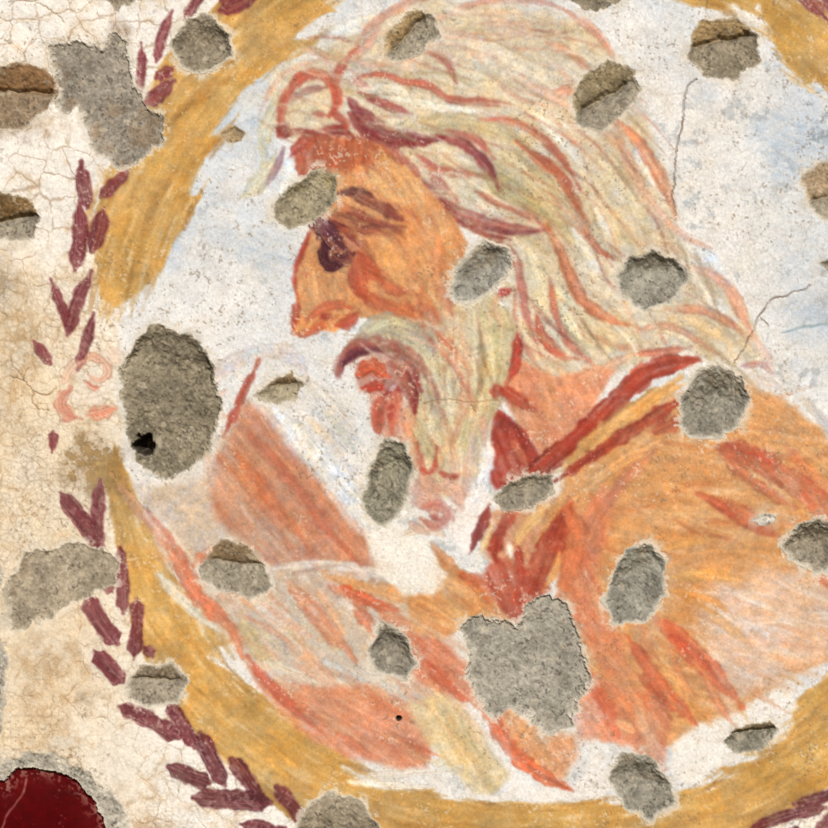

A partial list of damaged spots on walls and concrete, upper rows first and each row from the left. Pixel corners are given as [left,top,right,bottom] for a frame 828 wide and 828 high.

crack [9,0,65,24]
spalling [47,31,166,171]
crack [671,79,698,216]
crack [734,285,811,364]
spalling [117,324,224,481]
spalling [0,542,121,632]
spalling [0,637,13,736]
spalling [460,595,593,737]
spalling [0,746,133,828]